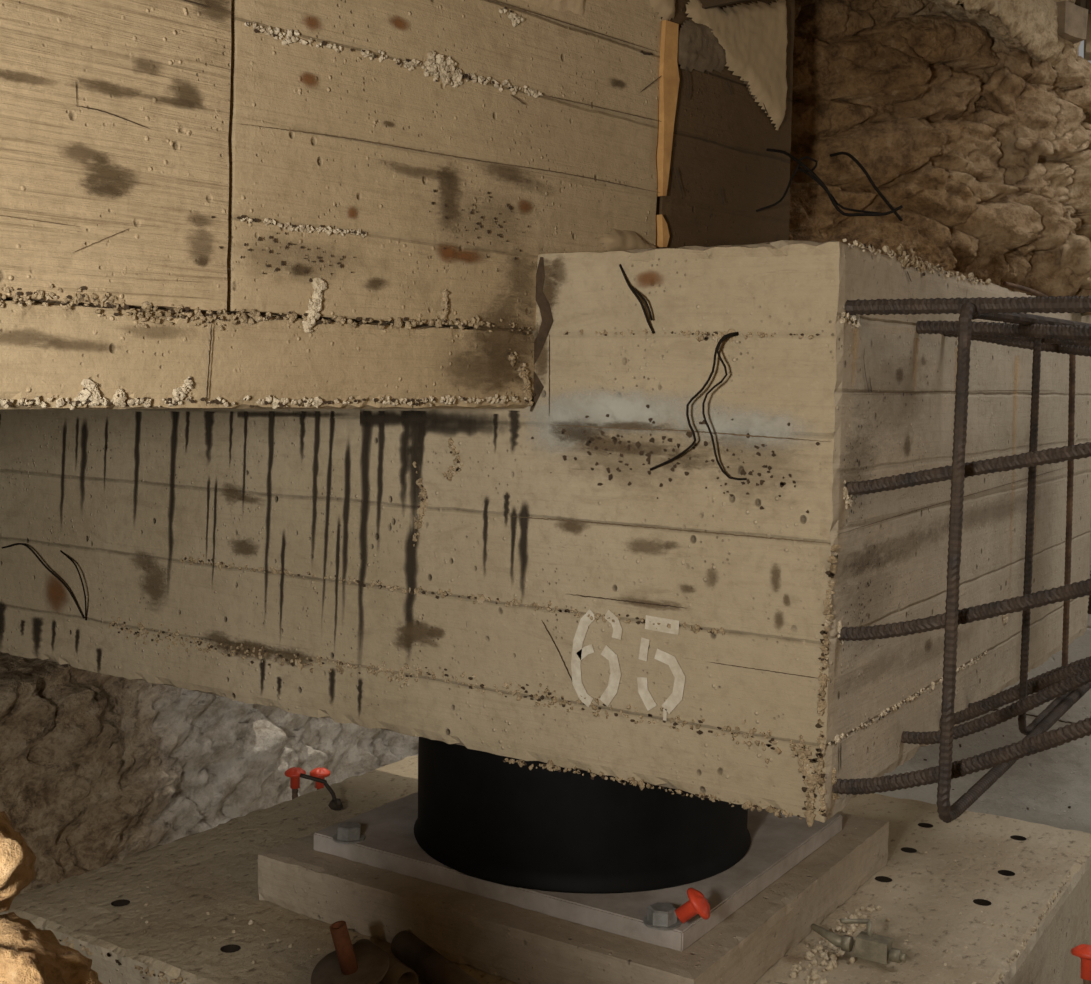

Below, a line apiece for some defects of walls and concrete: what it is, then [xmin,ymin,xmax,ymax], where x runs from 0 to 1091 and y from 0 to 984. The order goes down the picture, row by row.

spalling [691,328,736,345]
spalling [839,239,1091,357]
leakage [60,418,87,515]
leakage [144,411,190,600]
leakage [206,410,519,647]
leakage [504,493,529,592]
leakage [531,393,796,499]
spalling [843,442,1091,509]
leakage [209,634,309,694]
spalling [504,544,1091,827]
spalling [57,937,186,984]
spalling [1071,944,1091,984]